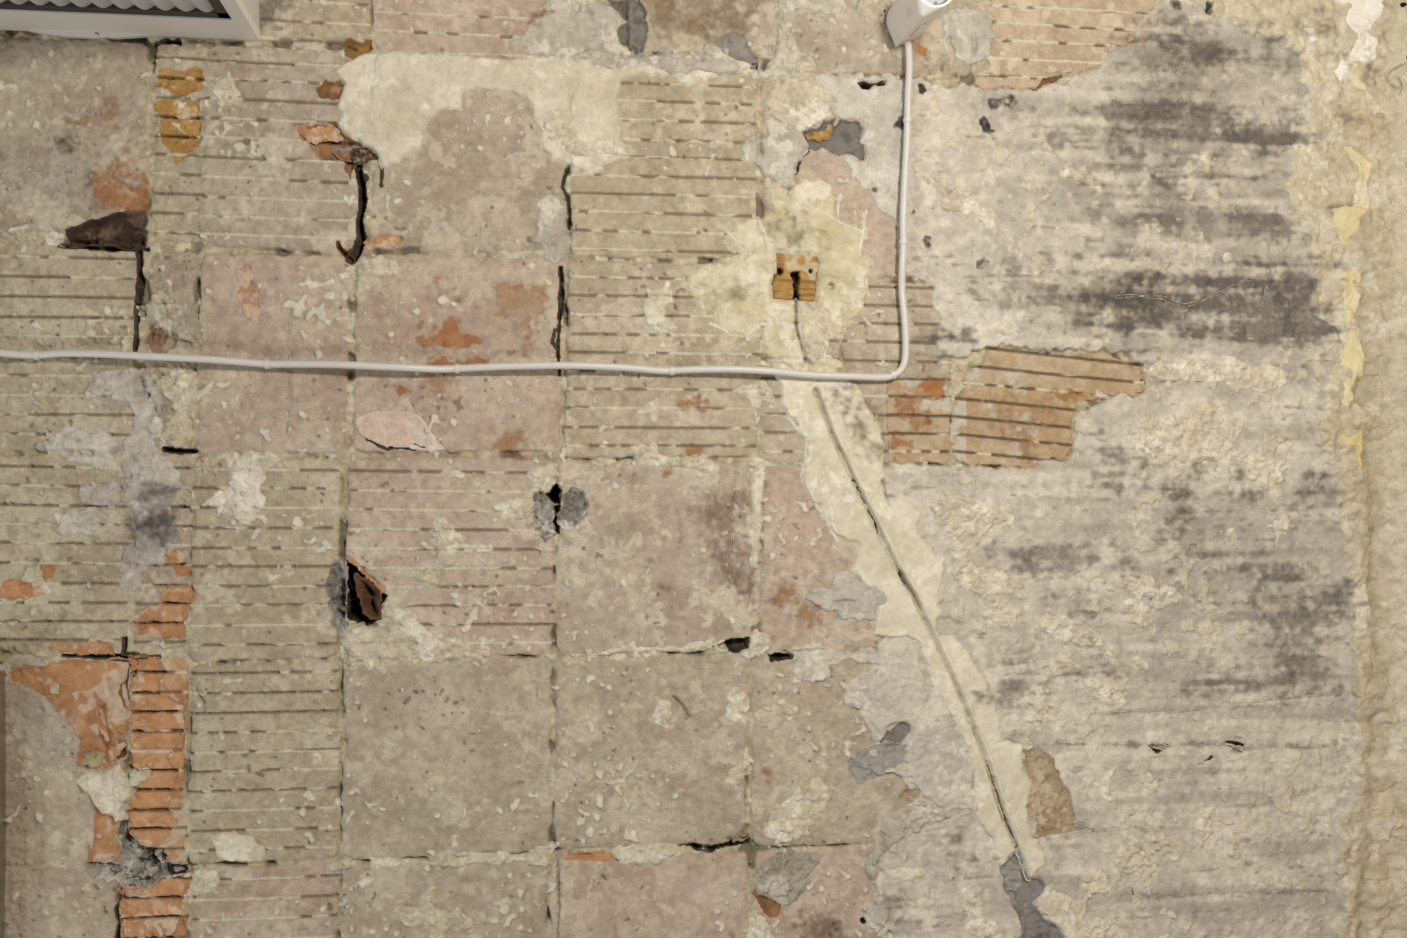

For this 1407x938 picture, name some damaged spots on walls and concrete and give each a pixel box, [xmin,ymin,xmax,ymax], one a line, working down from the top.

damp [1164,17,1235,59]
flaking render [293,0,915,227]
damp [1111,101,1307,158]
crack [336,147,384,265]
crack [561,167,572,231]
crack [550,266,565,377]
damp [1068,255,1339,344]
spalling [886,344,1145,469]
spalling [6,640,185,864]
flaking render [786,642,978,823]
damp [1194,679,1259,688]
spalling [999,851,1102,938]